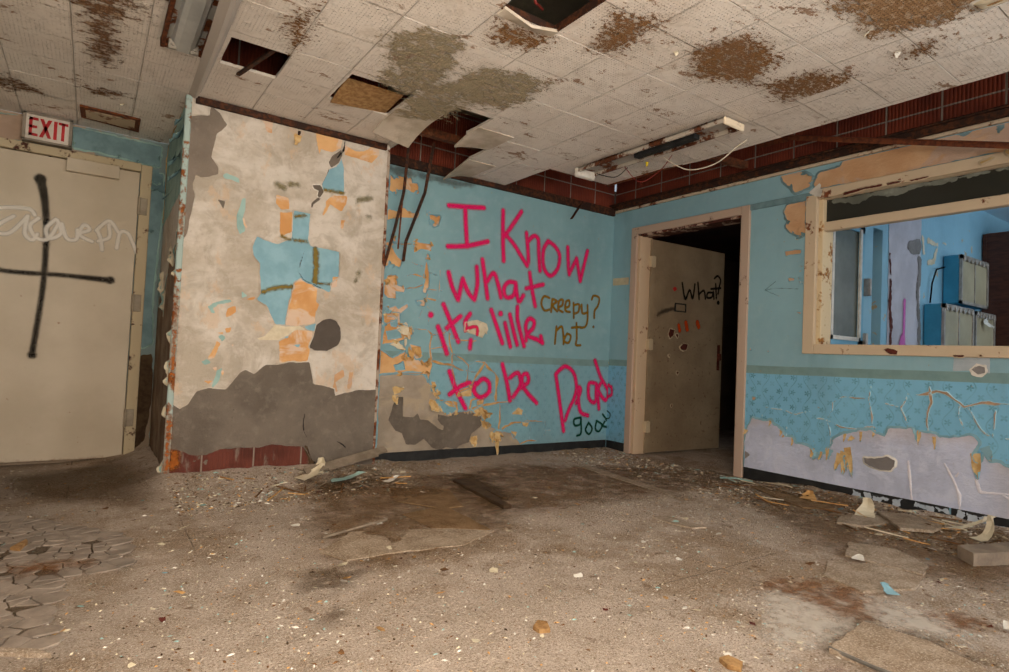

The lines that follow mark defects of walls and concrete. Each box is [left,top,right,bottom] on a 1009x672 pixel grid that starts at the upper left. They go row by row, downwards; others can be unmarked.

water stain [68,0,162,69]
water stain [368,21,558,126]
water stain [484,15,559,57]
water stain [576,6,674,57]
water stain [678,23,863,103]
water stain [822,0,978,72]
peeling [780,123,1009,284]
peeling [72,105,530,473]
peeling [883,253,898,355]
peeling [908,235,947,345]
spalling [969,354,988,377]
flaking render [743,416,1009,541]